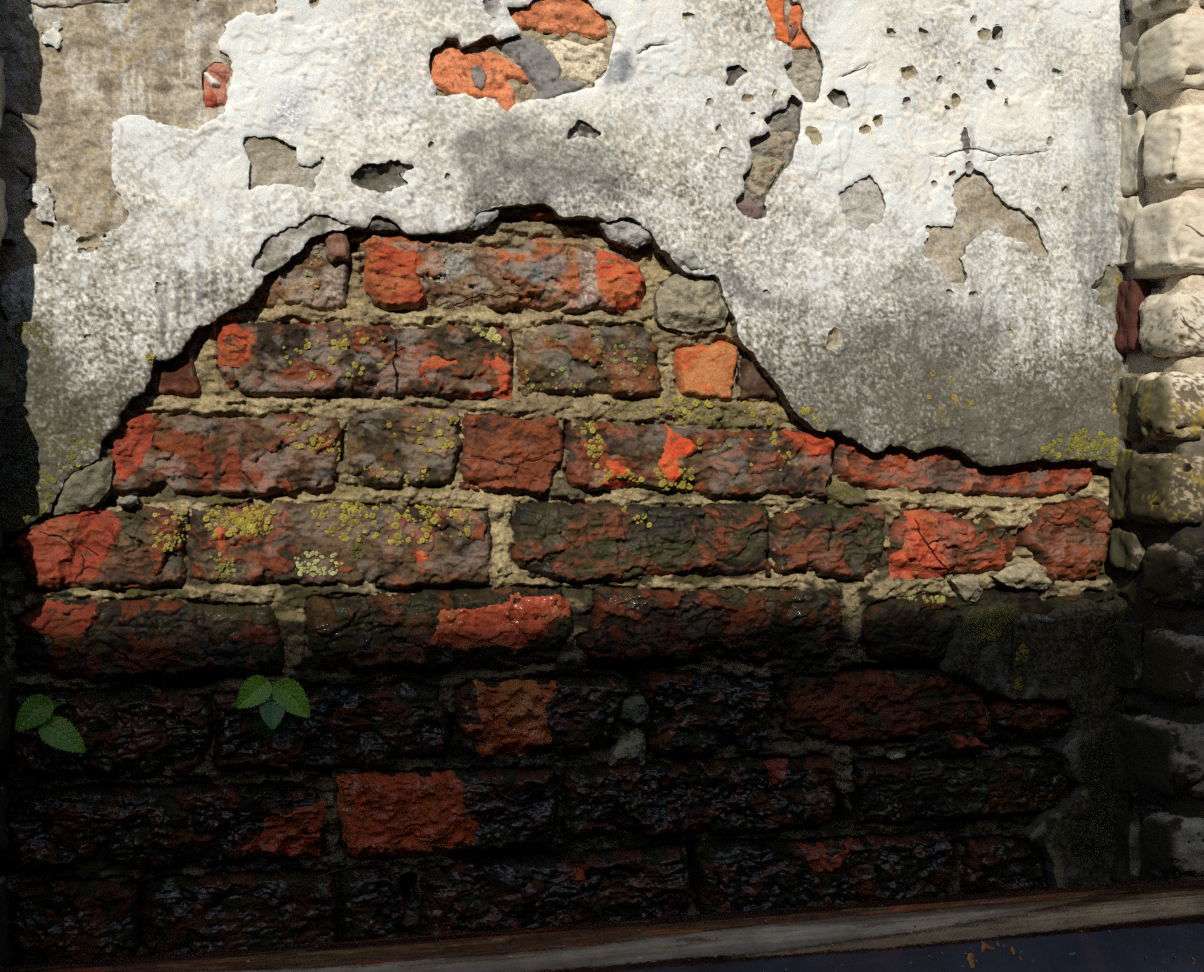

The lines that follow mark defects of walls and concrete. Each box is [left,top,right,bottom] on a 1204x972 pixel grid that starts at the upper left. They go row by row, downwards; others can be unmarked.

peeling [0,0,278,420]
peeling [243,136,325,193]
peeling [351,161,413,193]
spalling [429,0,616,111]
peeling [726,65,746,86]
spalling [736,0,848,219]
crack [929,148,1048,161]
peeling [1091,264,1126,398]
water stain [0,326,101,499]
spalling [0,204,1118,969]